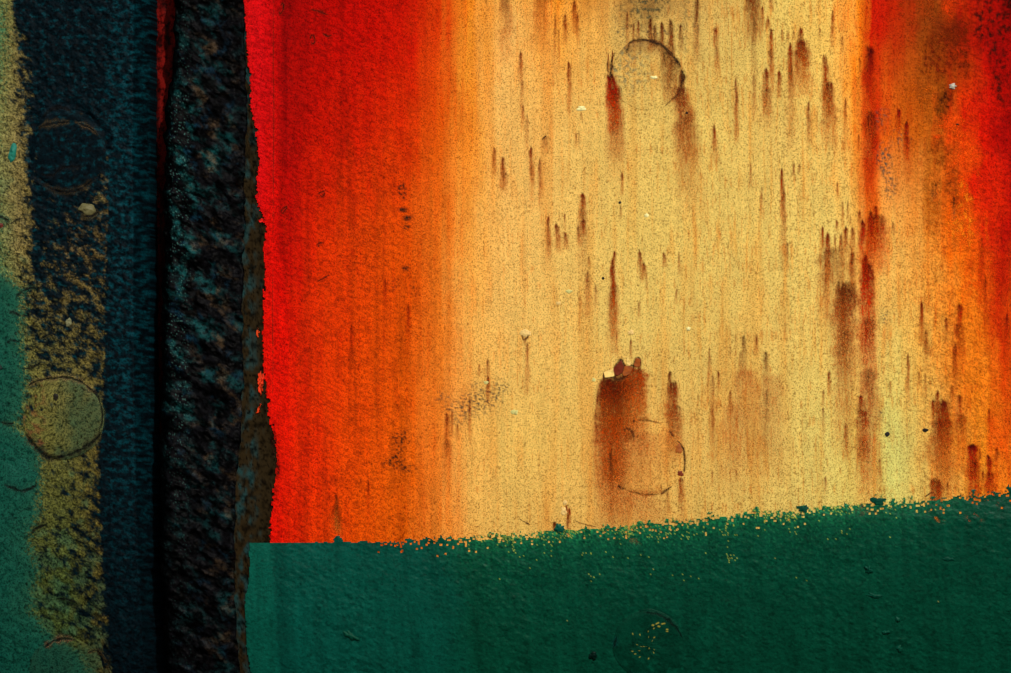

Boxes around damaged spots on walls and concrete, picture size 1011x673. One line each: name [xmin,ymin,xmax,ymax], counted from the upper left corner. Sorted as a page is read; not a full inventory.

rust [606,51,621,132]
rust [627,12,692,141]
rust [746,0,809,103]
rust [823,55,846,128]
rust [858,47,876,192]
rust [547,194,586,244]
rust [822,206,885,448]
rust [945,304,963,372]
rust [595,368,648,485]
rust [665,371,678,429]
rust [930,388,961,518]
rust [967,444,993,495]